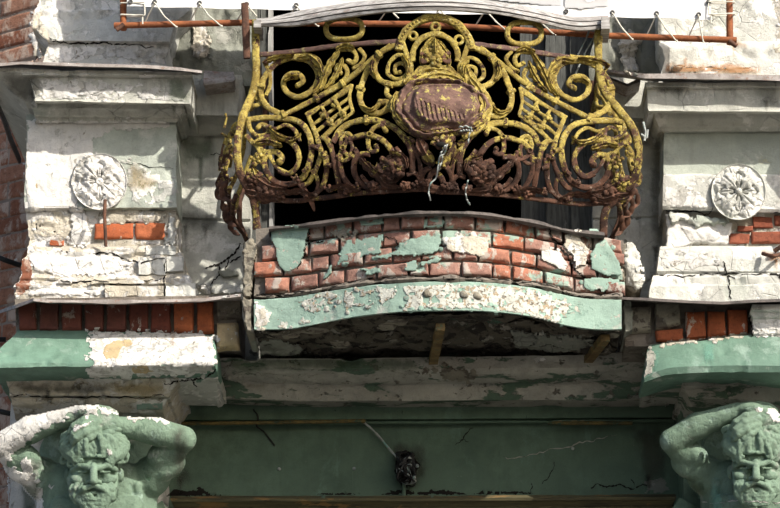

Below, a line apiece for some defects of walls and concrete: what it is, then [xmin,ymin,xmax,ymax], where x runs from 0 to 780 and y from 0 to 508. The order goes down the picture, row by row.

peeling [14,116,179,299]
peeling [664,186,729,229]
crack [205,243,241,286]
peeling [271,225,309,272]
peeling [196,238,596,363]
peeling [324,217,491,279]
peeling [542,217,644,352]
crack [659,261,780,299]
peeling [84,327,220,381]
spalling [642,320,780,377]
peeling [0,404,169,508]
crack [504,435,615,492]